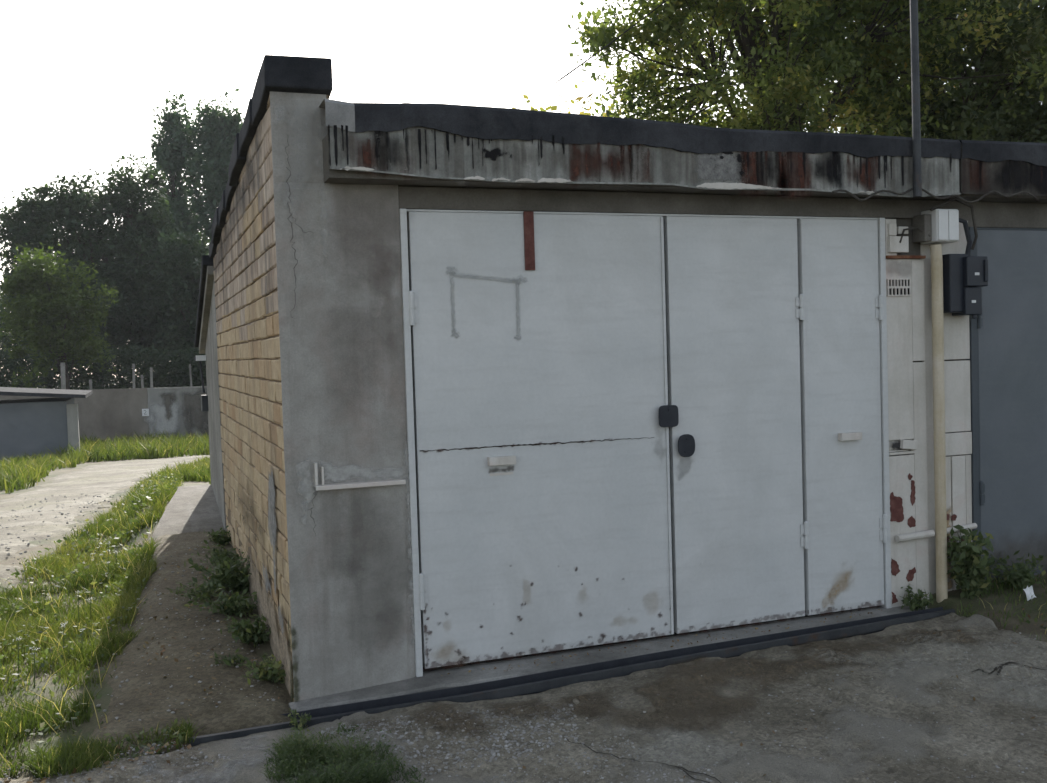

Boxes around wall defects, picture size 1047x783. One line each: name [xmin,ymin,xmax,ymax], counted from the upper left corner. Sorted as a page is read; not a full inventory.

corrosion [358,139,385,171]
corrosion [570,142,650,182]
corrosion [741,151,764,193]
corrosion [777,151,811,199]
crack [285,140,313,318]